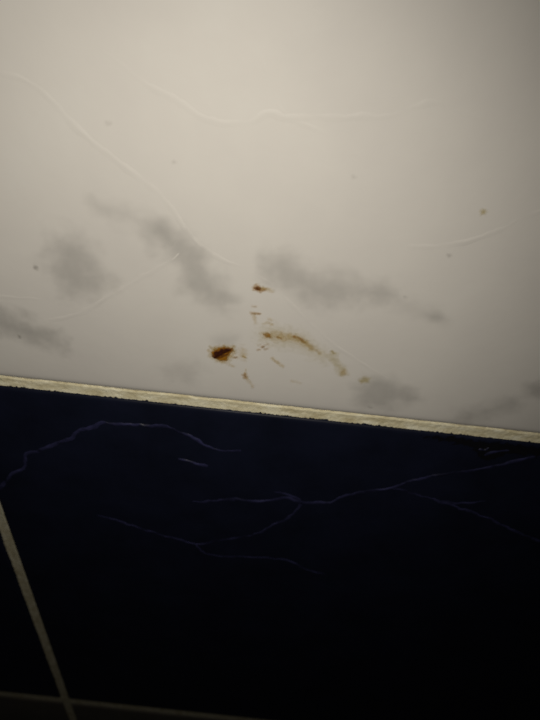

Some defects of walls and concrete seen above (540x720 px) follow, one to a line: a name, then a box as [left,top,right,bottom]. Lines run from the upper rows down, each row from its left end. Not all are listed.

corrosion [211,347,233,361]
crack [0,421,241,490]
crack [97,456,540,574]